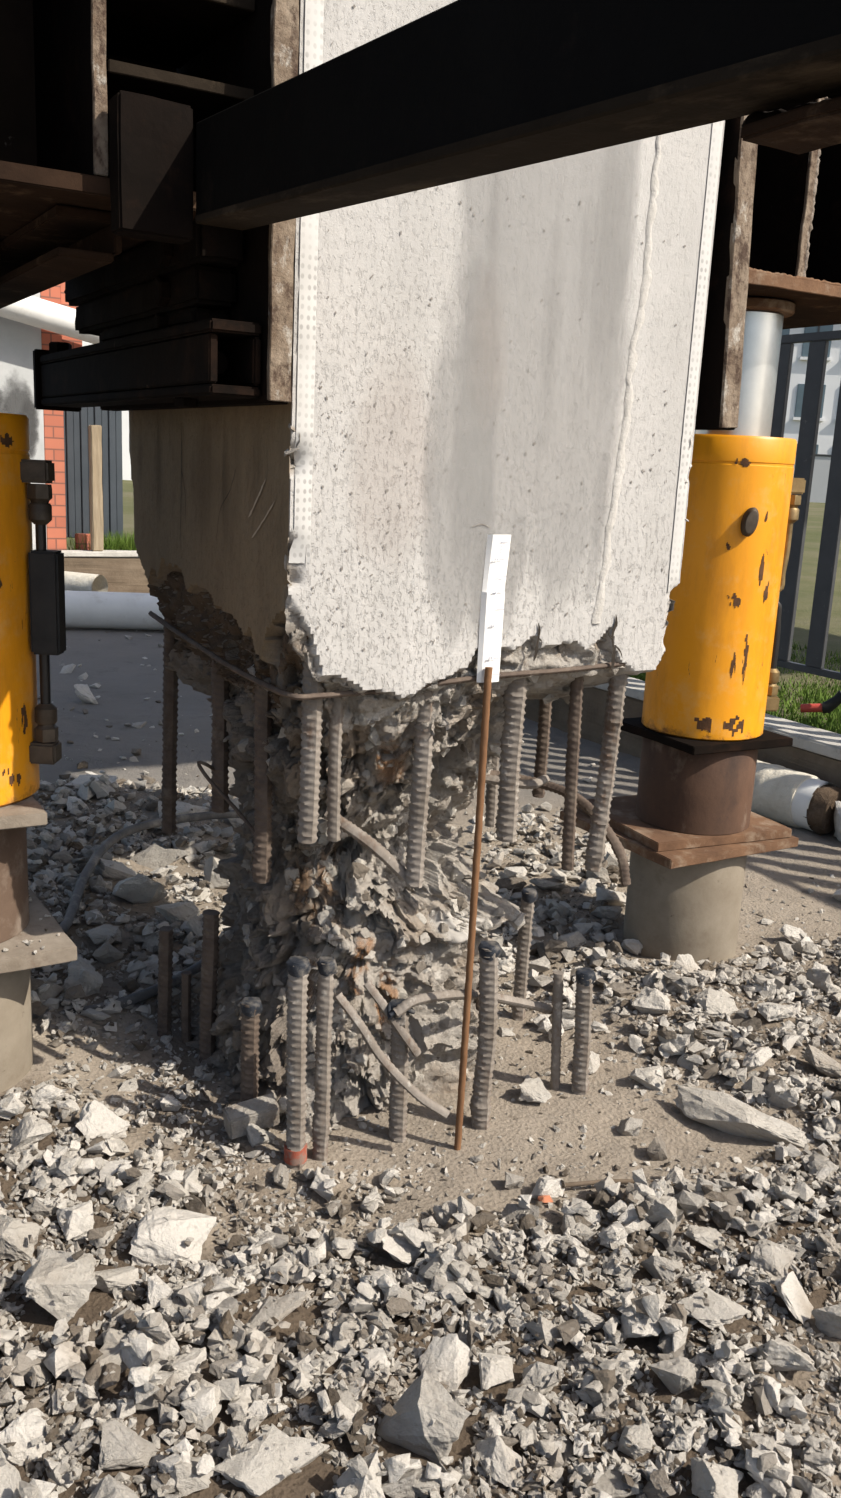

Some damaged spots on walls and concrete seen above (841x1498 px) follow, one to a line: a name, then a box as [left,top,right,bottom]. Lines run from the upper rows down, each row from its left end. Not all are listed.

spalling [147,135,686,888]
spalling [199,909,220,1063]
spalling [284,888,596,1170]